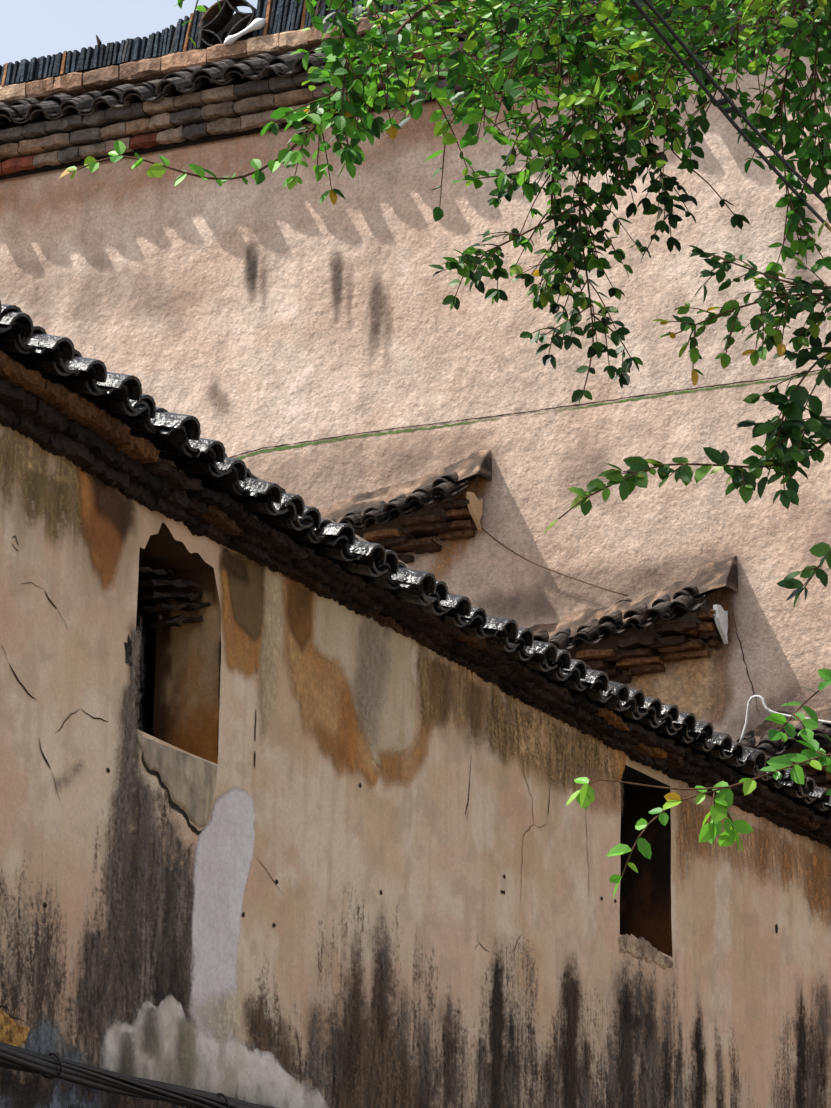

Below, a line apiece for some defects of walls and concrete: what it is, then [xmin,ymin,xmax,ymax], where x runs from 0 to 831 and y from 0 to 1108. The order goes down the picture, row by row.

damp [245,240,266,298]
damp [331,255,352,311]
corrosion [79,468,135,588]
crack [1,644,37,700]
corrosion [283,580,436,786]
crack [39,709,109,797]
damp [78,622,456,1108]
flaking render [0,1005,88,1063]
damp [477,954,517,1108]
damp [544,961,593,1108]
damp [606,968,726,1108]
damp [796,985,831,1108]